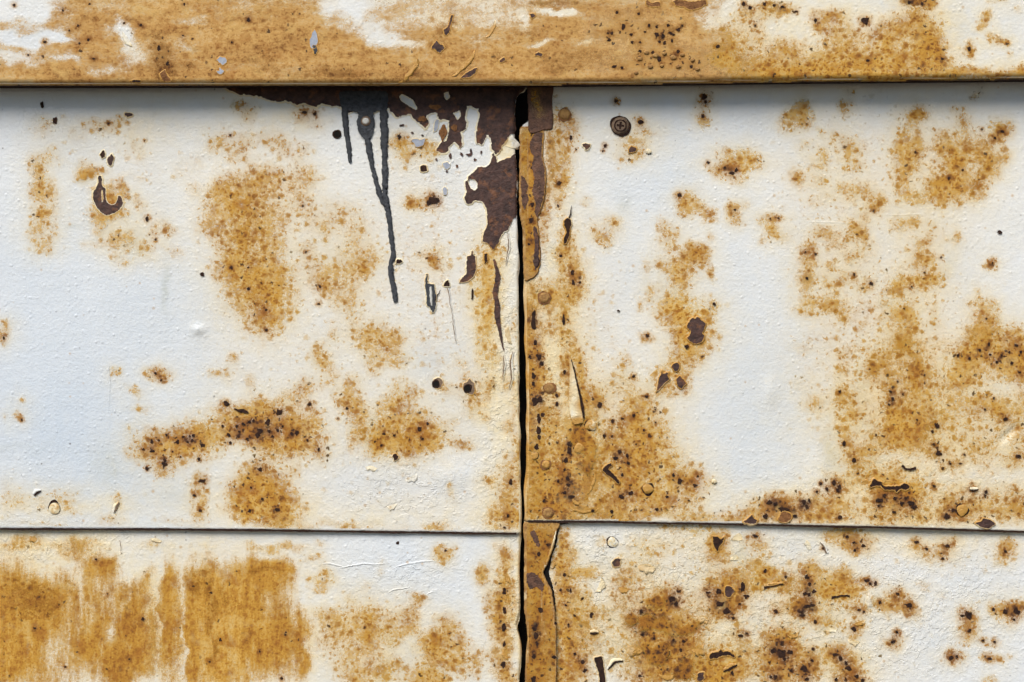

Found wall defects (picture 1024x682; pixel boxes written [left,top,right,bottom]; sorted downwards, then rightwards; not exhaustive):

corrosion [27,148,58,256]
corrosion [81,115,129,133]
peeling [91,149,125,216]
peeling [223,50,545,299]
corrosion [0,0,1024,127]
corrosion [126,131,471,528]
corrosion [485,101,1024,682]
corrosion [0,536,517,682]
peeling [526,572,544,592]
peeling [974,517,996,530]